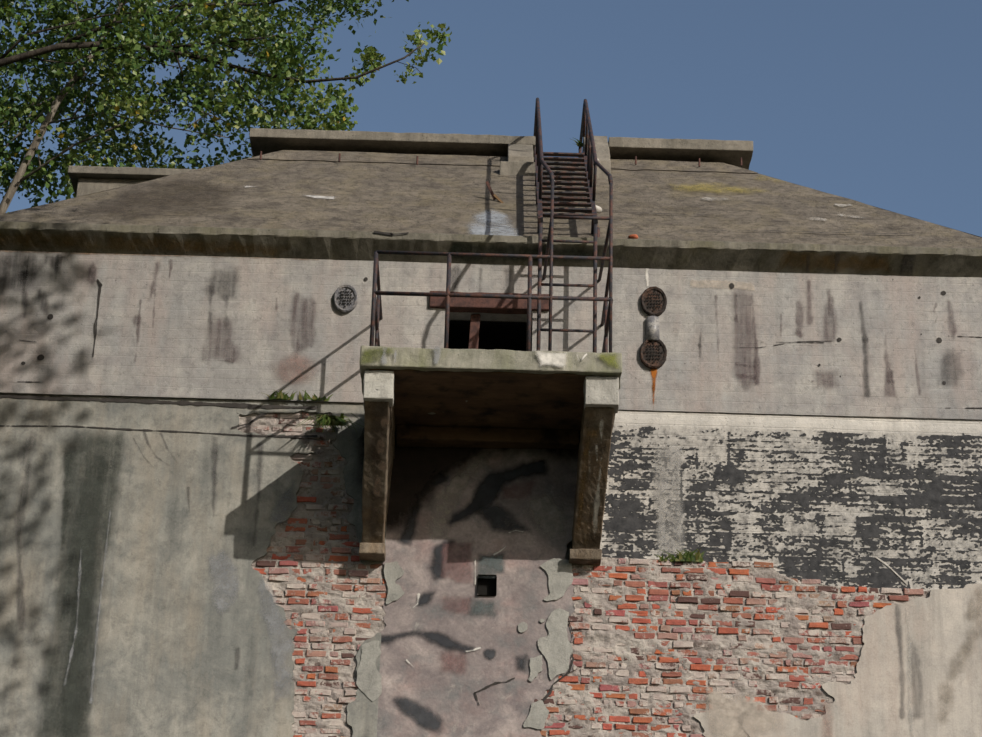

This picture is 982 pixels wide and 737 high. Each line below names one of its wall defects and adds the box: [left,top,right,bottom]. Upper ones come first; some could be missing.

water stain [0,255,60,306]
crack [0,381,318,438]
water stain [41,436,121,737]
flaking render [237,412,404,737]
flaking render [523,421,982,737]